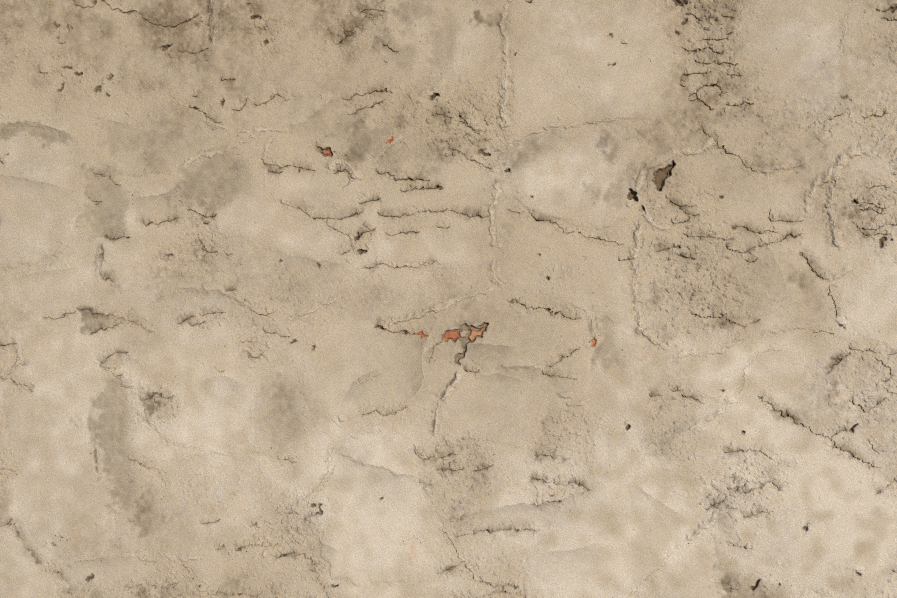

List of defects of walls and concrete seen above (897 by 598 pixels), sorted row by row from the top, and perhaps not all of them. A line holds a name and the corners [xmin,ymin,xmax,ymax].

spalling [664,0,755,116]
peeling [341,83,396,118]
peeling [259,150,446,196]
peeling [279,192,489,259]
spalling [633,173,805,351]
flaking render [442,321,488,342]
spalling [824,342,897,417]
spalling [408,432,494,488]
peeling [722,446,776,463]
crack [758,401,897,498]
spalling [701,474,788,522]